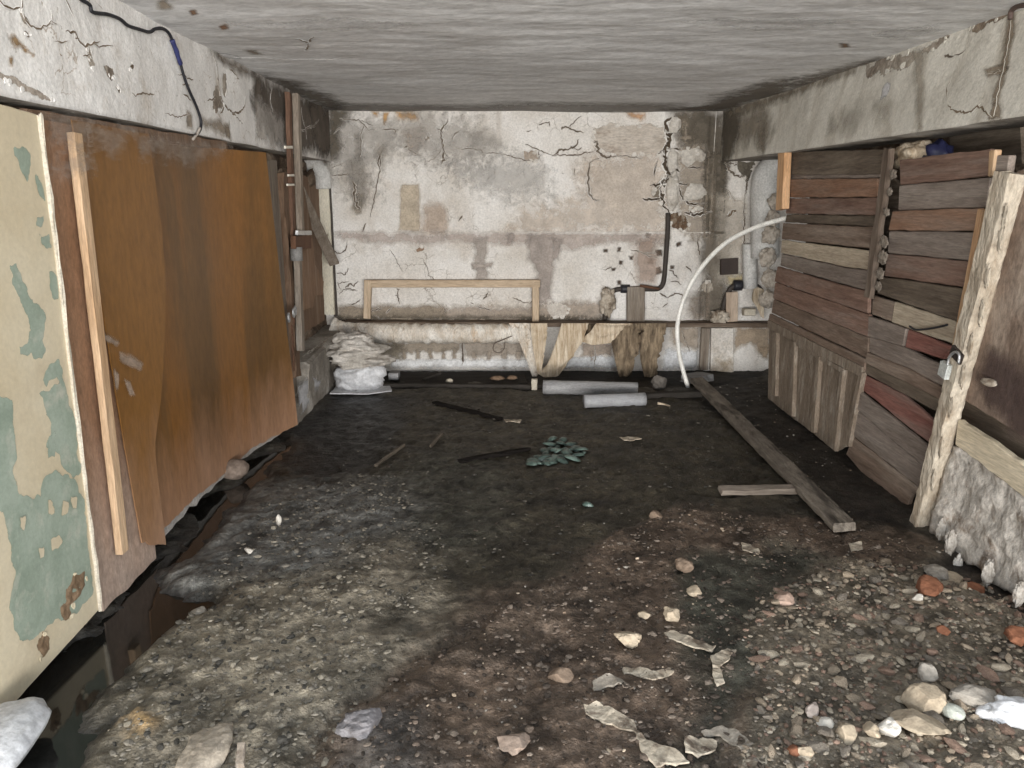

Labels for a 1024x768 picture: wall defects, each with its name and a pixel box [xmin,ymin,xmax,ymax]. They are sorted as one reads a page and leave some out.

crack [0,0,113,59]
crack [132,37,334,124]
flaking render [866,35,950,78]
crack [944,20,1011,118]
peeling [14,147,45,201]
peeling [36,217,51,249]
crack [301,107,748,318]
damp [217,53,876,368]
peeling [0,264,93,662]